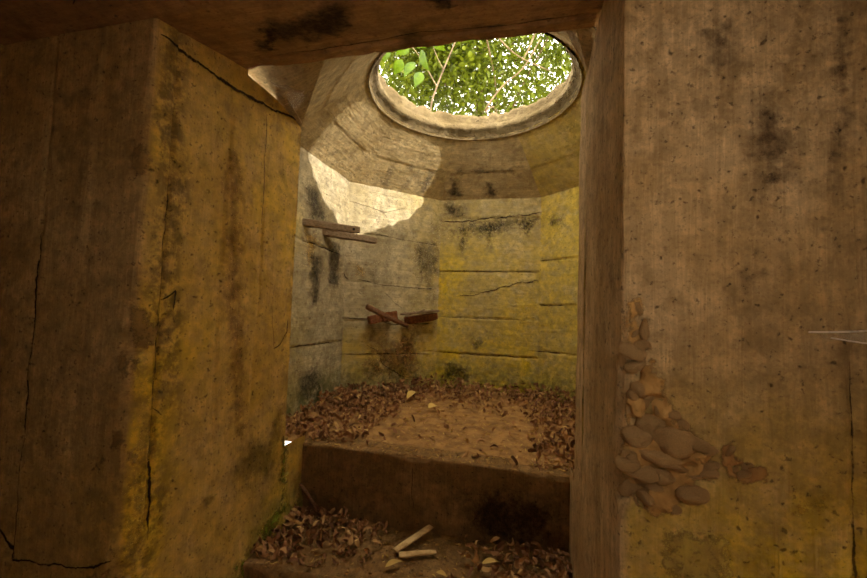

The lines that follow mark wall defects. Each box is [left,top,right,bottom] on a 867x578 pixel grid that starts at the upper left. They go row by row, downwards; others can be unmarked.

leakage [256,4,353,51]
spalling [248,60,324,127]
leakage [308,190,324,219]
leakage [311,244,339,303]
crack [272,292,558,380]
spalling [285,139,586,478]
crack [344,259,564,325]
crack [0,232,111,578]
spalling [614,298,768,517]
crack [849,362,857,578]